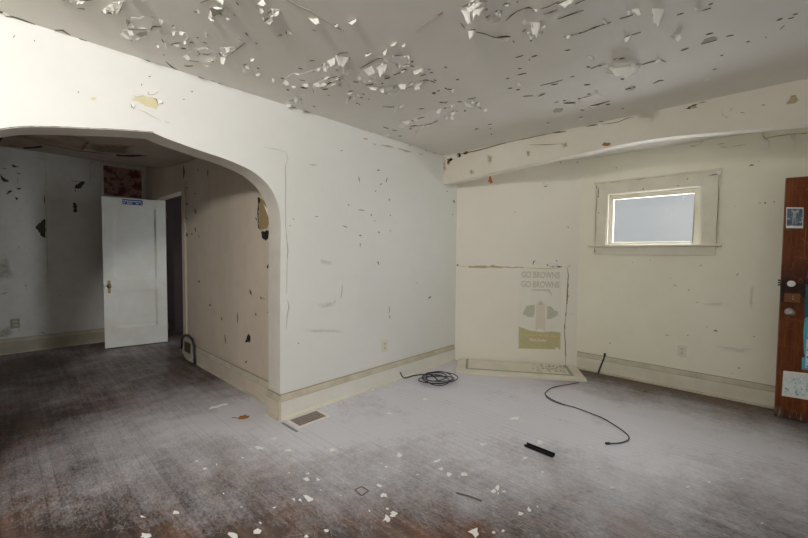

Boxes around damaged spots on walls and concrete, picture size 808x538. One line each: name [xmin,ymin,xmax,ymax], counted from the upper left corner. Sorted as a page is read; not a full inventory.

peeling [101,1,126,17]
peeling [461,0,518,42]
peeling [522,0,584,41]
peeling [120,16,248,69]
peeling [587,56,665,91]
peeling [130,83,169,123]
peeling [271,42,487,152]
spalling [35,219,46,238]
crack [457,264,571,365]